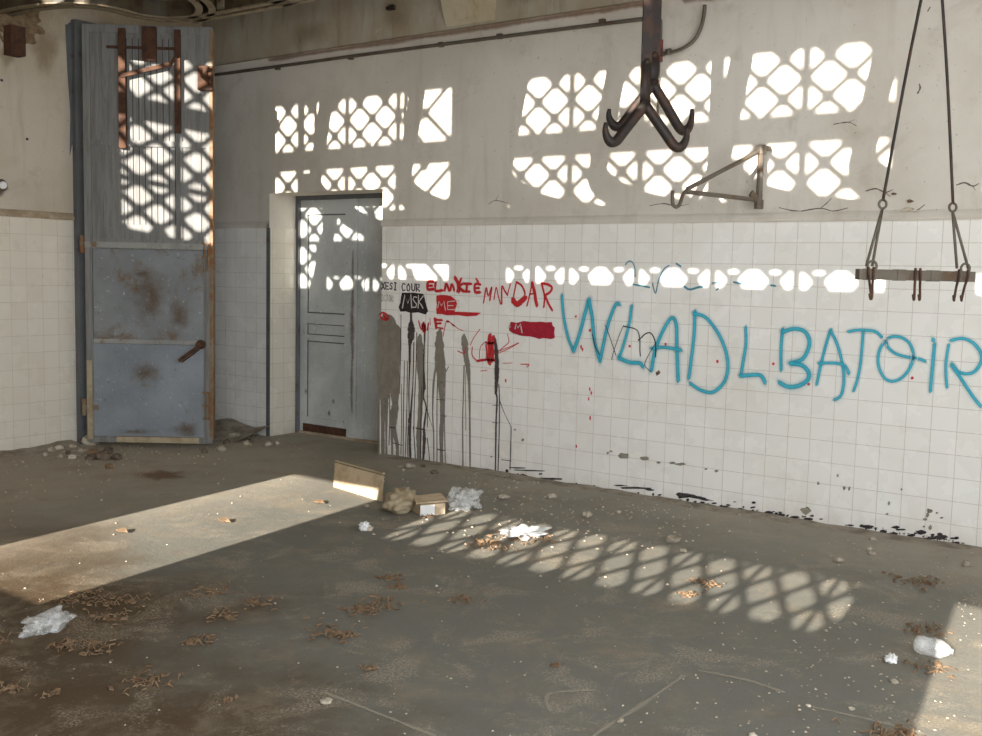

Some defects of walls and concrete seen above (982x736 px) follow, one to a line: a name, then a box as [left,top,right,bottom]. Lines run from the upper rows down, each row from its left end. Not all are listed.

spalling [0,11,45,45]
spalling [676,492,823,520]
spalling [845,509,964,544]